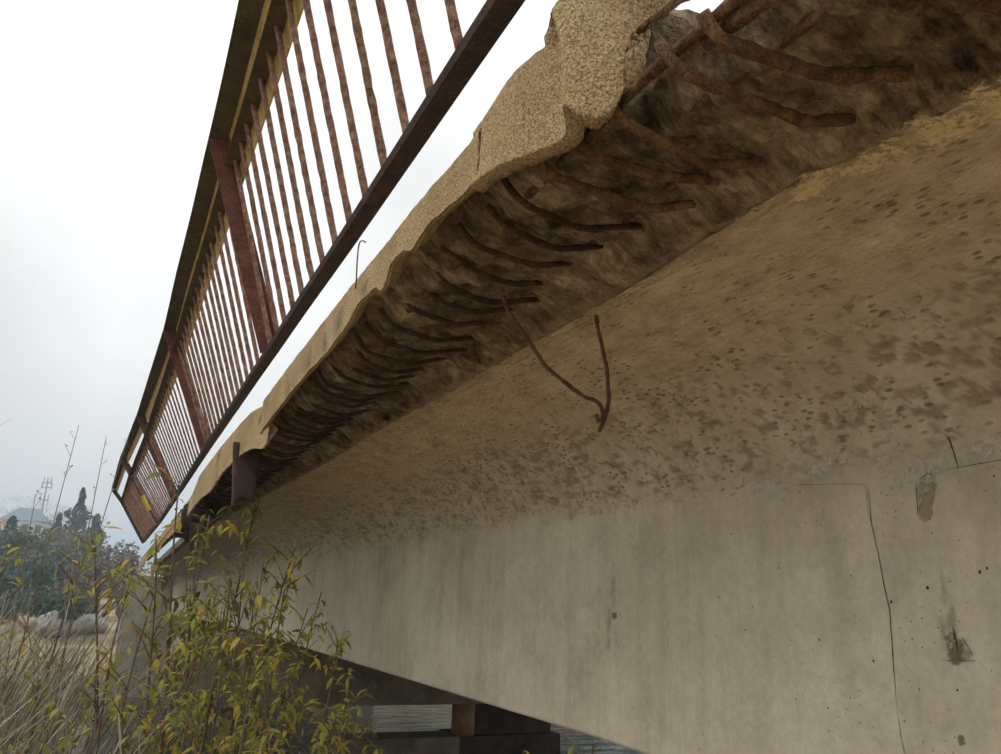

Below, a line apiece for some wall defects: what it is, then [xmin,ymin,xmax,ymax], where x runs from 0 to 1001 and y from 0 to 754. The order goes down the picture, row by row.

spalling [164,0,1001,542]
crack [942,437,1000,470]
crack [858,484,905,753]
water stain [945,625,972,664]